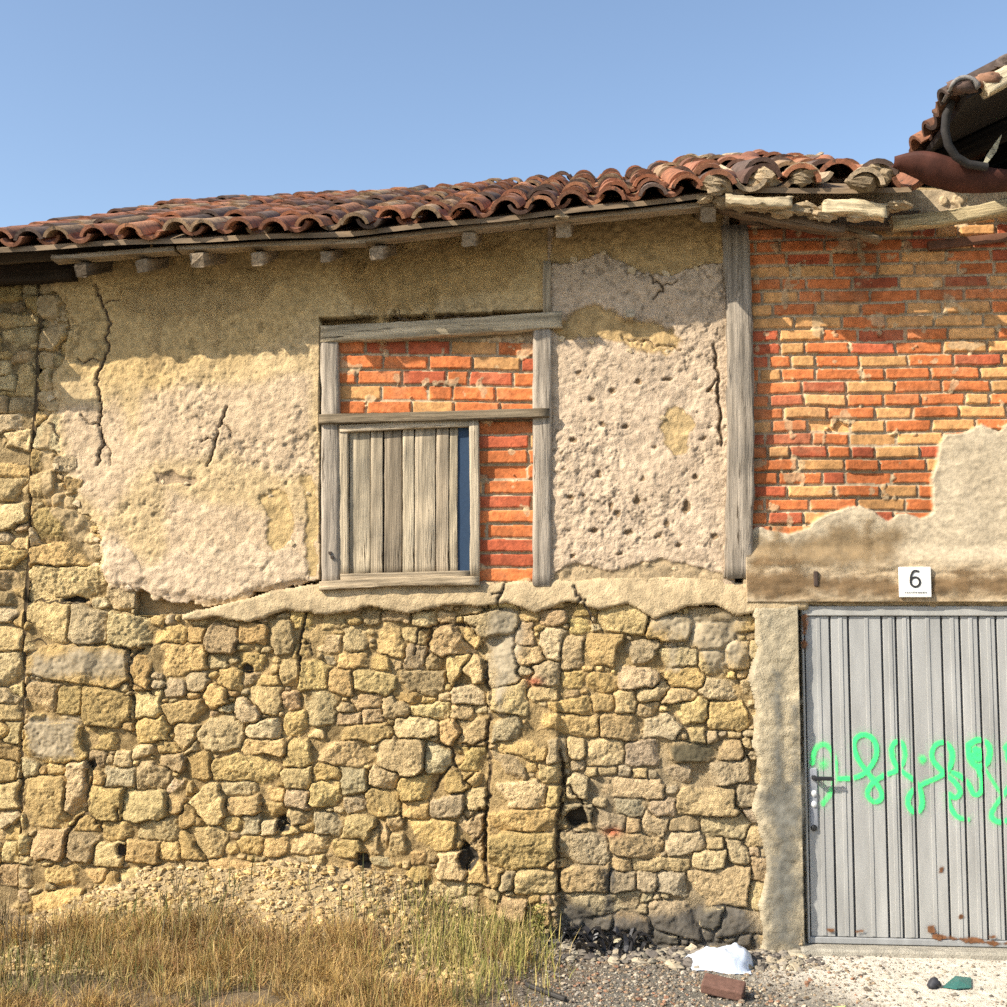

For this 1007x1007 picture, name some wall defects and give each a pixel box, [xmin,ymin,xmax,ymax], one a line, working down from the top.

spalling [554,305,680,355]
crack [78,286,119,463]
crack [202,407,231,466]
crack [20,285,83,856]
water stain [746,521,901,599]
water stain [931,570,1007,594]
crack [435,663,493,884]
corrosion [928,925,1007,946]